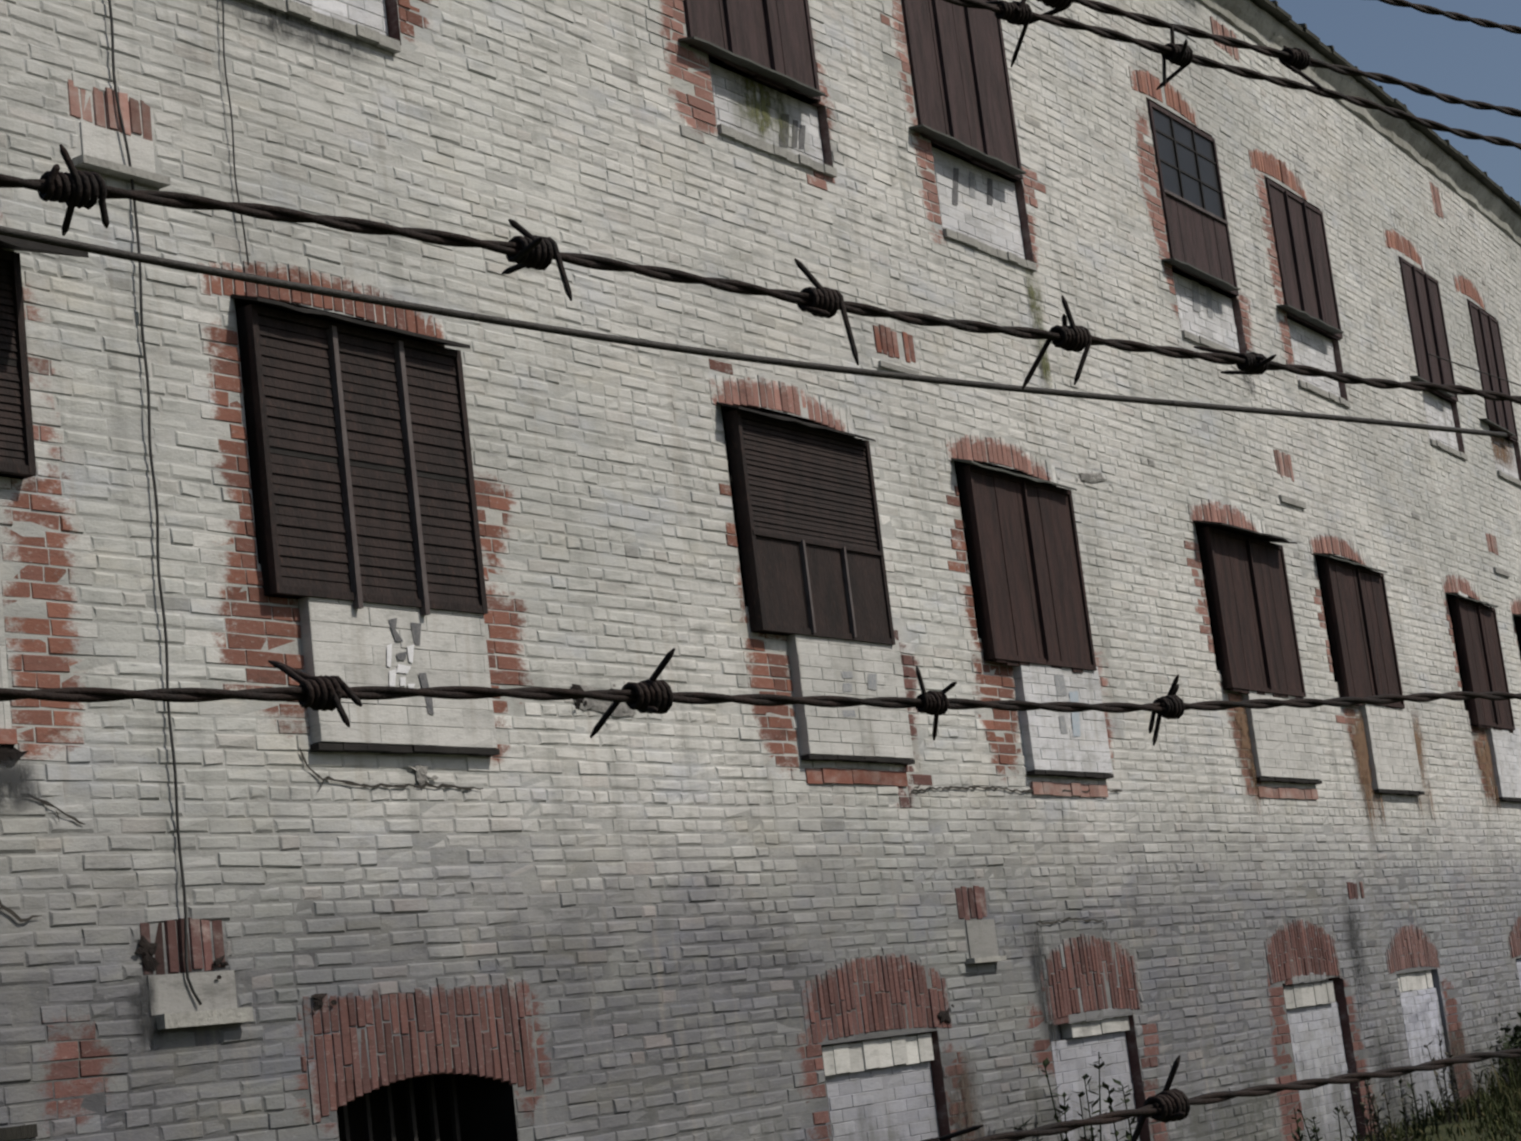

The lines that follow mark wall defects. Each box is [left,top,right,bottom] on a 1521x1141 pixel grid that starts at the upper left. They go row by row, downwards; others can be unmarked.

peeling [645,0,733,158]
leakage [1029,278,1050,378]
peeling [0,271,115,781]
peeling [182,297,312,750]
peeling [1183,540,1214,653]
leakage [0,761,36,807]
peeling [1213,682,1270,805]